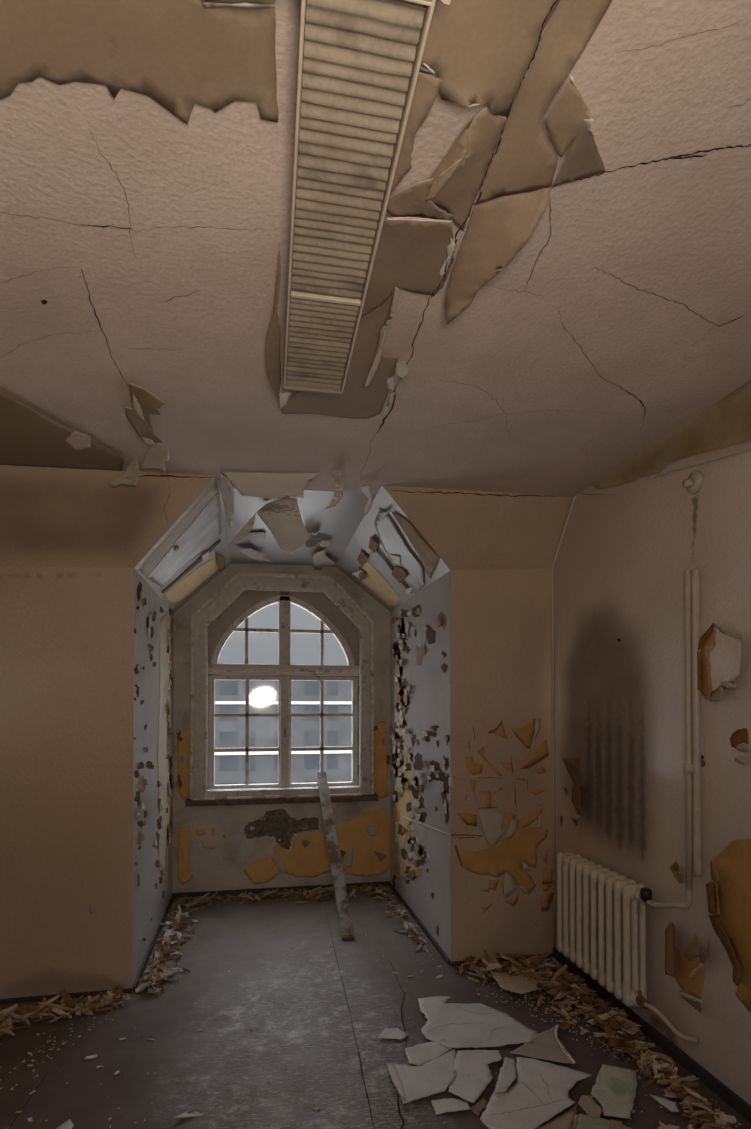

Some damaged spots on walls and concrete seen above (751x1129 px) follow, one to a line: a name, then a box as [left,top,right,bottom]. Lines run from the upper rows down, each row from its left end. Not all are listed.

peeling [0,0,279,125]
crack [2,131,265,257]
peeling [266,0,612,419]
crack [361,0,751,473]
crack [1,267,185,385]
peeling [0,383,169,487]
peeling [133,472,344,908]
peeling [243,485,585,952]
peeling [665,838,751,1013]
crack [389,960,407,1048]
crack [397,1095,405,1129]